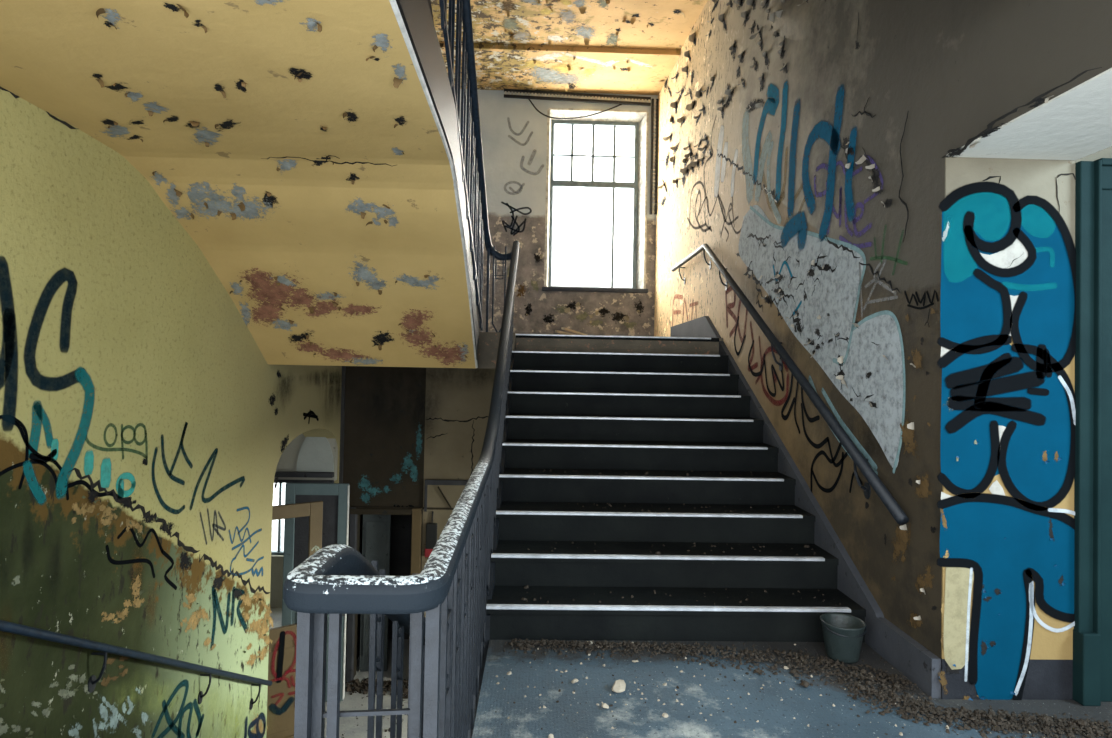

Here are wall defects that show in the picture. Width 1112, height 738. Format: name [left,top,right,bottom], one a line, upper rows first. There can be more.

peeling [92,73,241,147]
peeling [164,3,207,33]
peeling [214,79,247,98]
peeling [288,67,313,82]
peeling [366,33,407,88]
peeling [500,0,656,91]
peeling [654,0,789,208]
crack [261,155,395,166]
peeling [150,171,282,221]
peeling [229,261,471,368]
crack [425,416,488,476]
peeling [49,656,154,738]